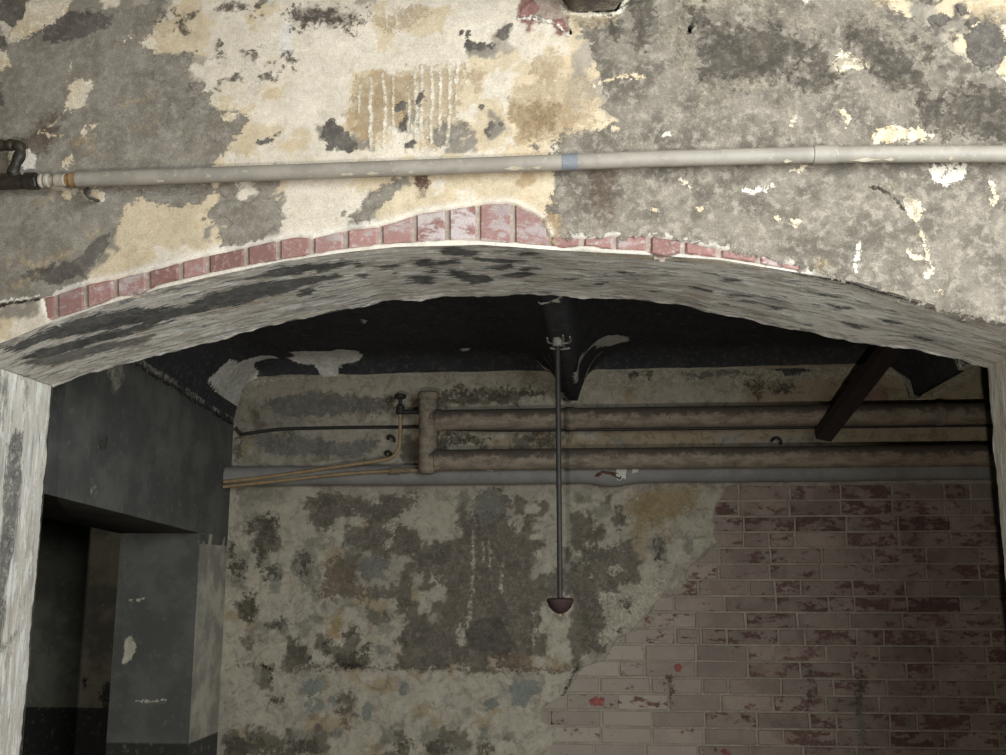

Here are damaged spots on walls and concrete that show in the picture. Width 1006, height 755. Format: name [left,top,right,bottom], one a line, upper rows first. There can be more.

damp [214,0,268,21]
damp [240,44,299,83]
damp [280,2,432,38]
damp [342,60,484,153]
damp [507,48,606,143]
damp [563,0,661,54]
damp [899,27,1006,145]
damp [8,148,36,170]
peeling [0,0,1006,368]
peeling [208,335,862,408]
flaking render [882,359,987,403]
flaking render [302,483,1006,755]